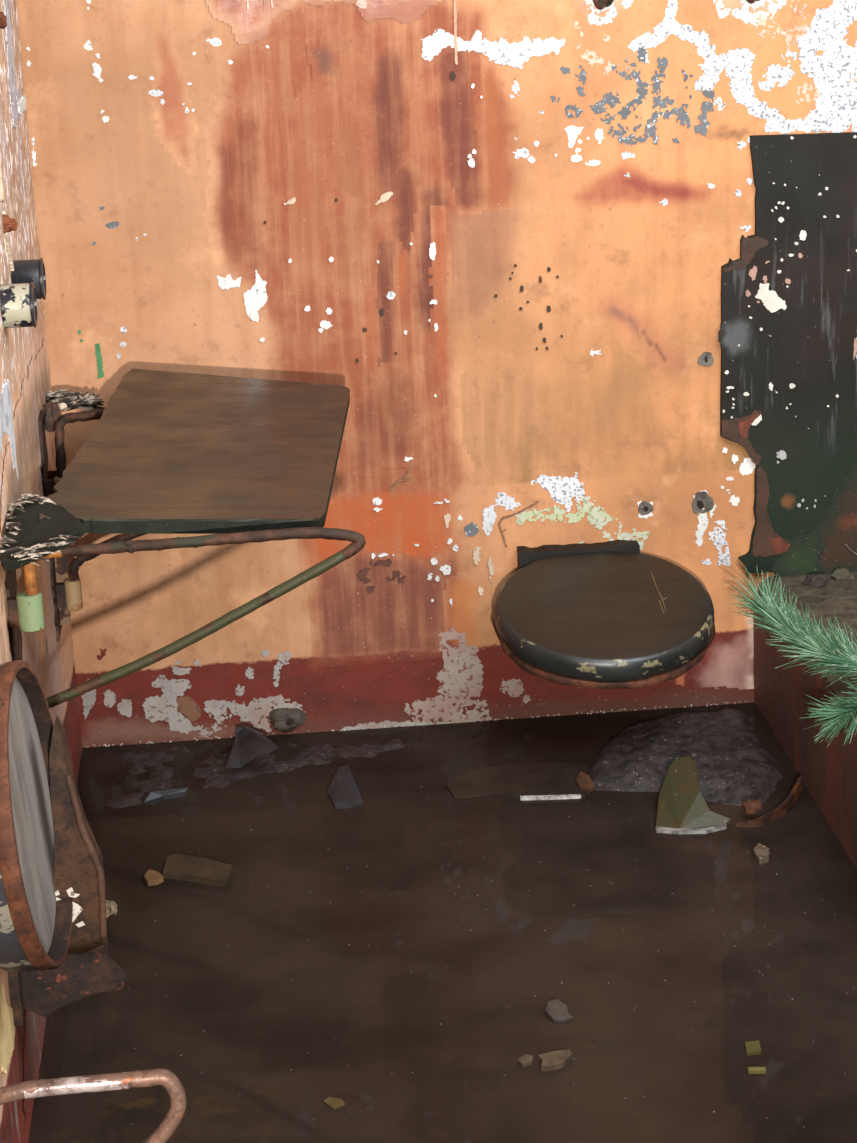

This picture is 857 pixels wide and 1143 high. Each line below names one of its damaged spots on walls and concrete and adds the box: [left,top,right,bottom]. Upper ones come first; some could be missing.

peeling [421,0,857,177]
rust [565,129,721,216]
peeling [217,270,268,323]
peeling [318,307,333,333]
water stain [203,0,699,677]
peeling [723,225,807,336]
peeling [0,379,18,478]
peeling [427,558,451,582]
peeling [433,472,654,595]
peeling [81,650,305,737]
peeling [339,627,499,731]
peeling [499,678,531,704]